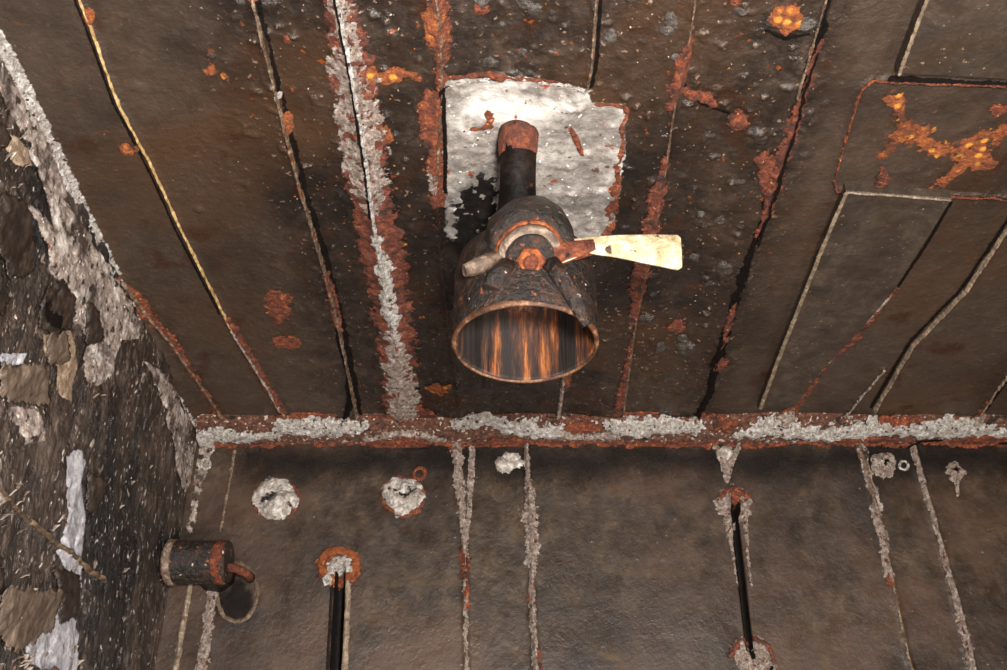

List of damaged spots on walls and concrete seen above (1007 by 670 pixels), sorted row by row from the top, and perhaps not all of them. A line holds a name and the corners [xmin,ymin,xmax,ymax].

corrosion [202,63,227,79]
peeling [0,58,142,445]
corrosion [213,0,1007,450]
peeling [143,361,215,533]
peeling [0,450,107,670]
crack [746,647,774,670]